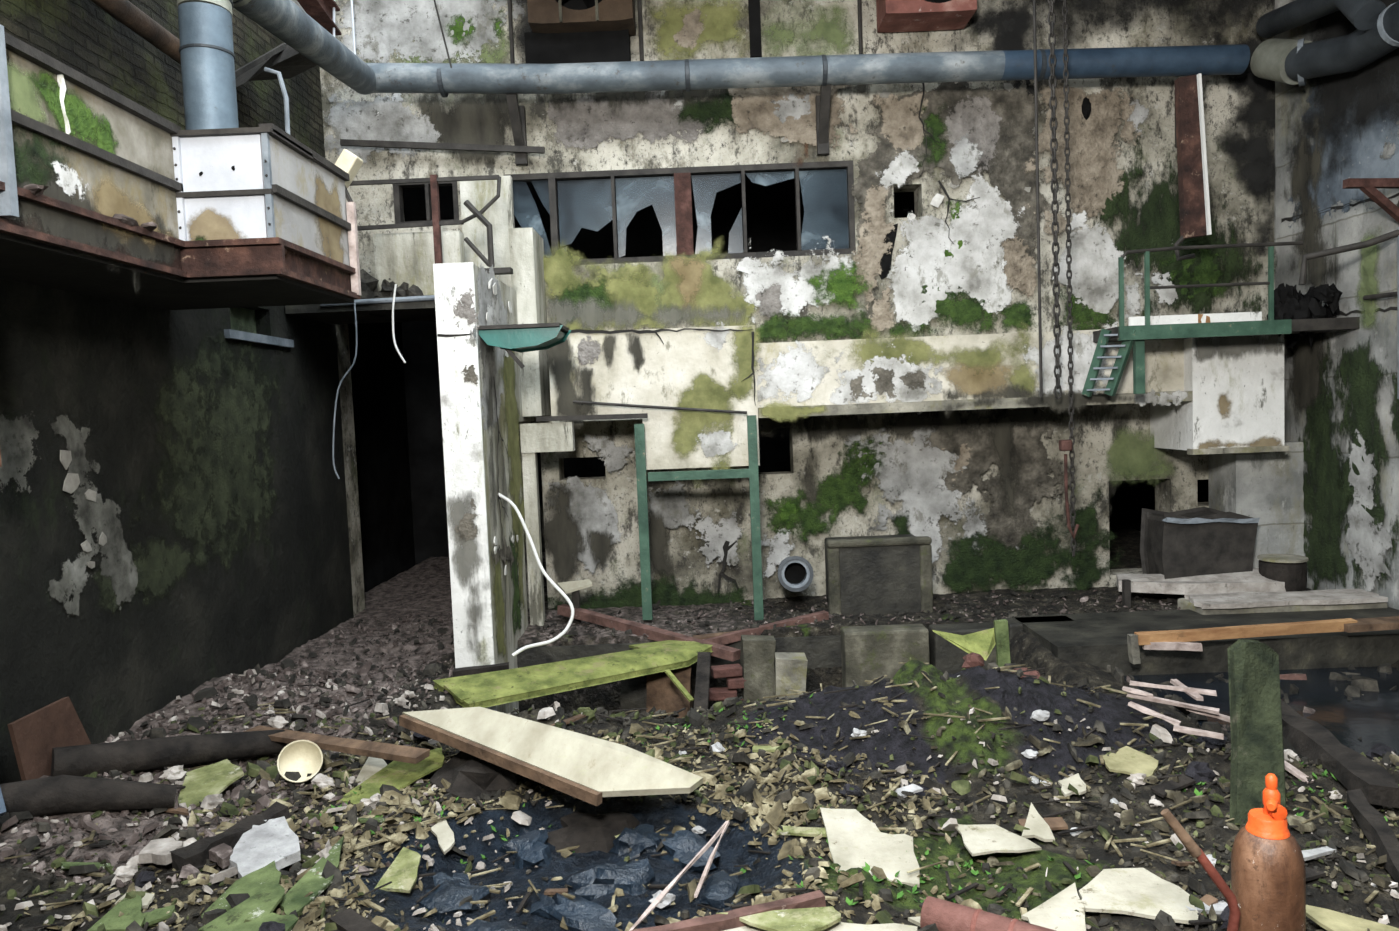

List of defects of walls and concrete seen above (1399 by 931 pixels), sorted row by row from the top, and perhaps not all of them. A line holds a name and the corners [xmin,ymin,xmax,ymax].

peeling [1288,86,1399,228]
corrosion [93,180,171,244]
corrosion [189,209,242,241]
corrosion [284,176,344,271]
flaking render [728,79,1179,563]
spalling [1135,389,1188,407]
flaking render [0,411,138,620]
flaking render [761,528,795,578]
flaking render [1345,429,1393,594]